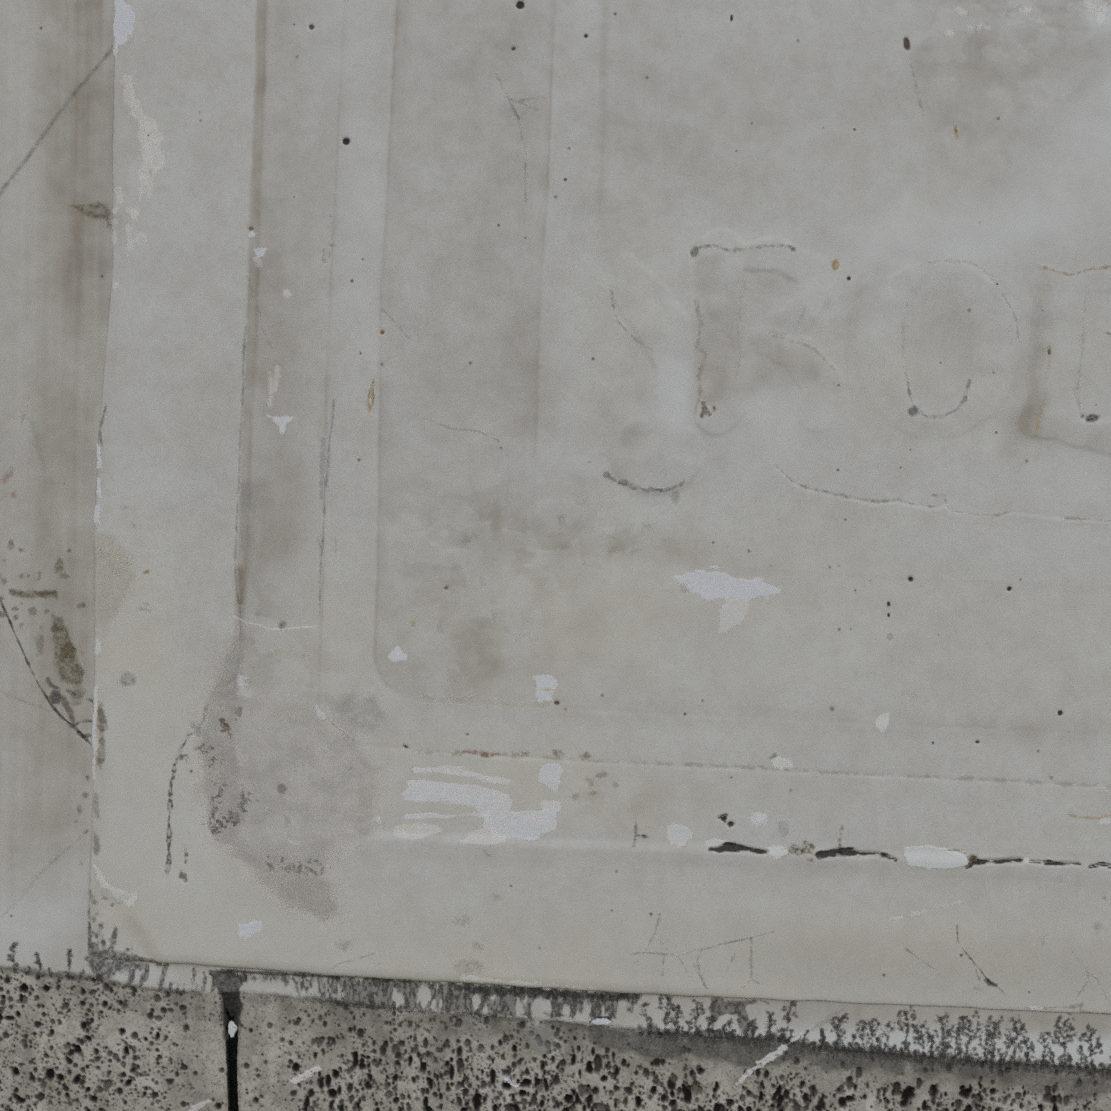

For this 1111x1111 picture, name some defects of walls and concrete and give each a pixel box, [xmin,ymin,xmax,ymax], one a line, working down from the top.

peeling [113,0,135,55]
leakage [9,589,58,598]
crack [0,599,92,744]
leakage [85,910,1111,1100]